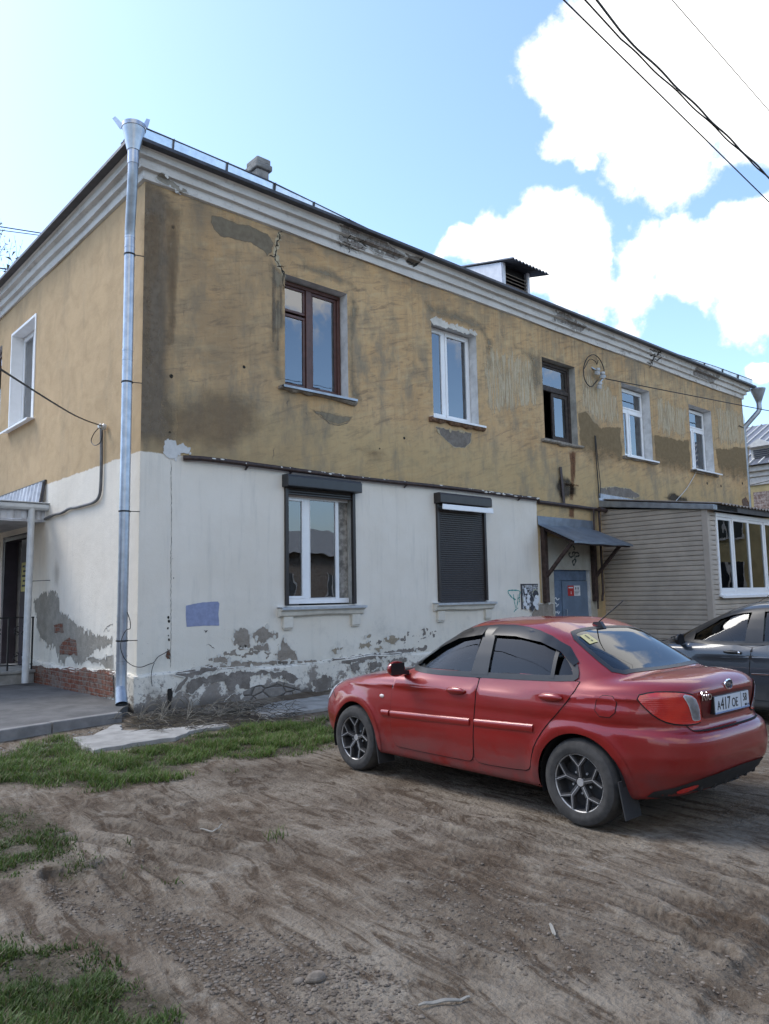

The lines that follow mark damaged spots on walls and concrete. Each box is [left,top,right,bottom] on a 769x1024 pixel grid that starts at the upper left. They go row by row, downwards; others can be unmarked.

peeling [155,171,190,195]
leakage [211,216,273,255]
crack [270,231,286,290]
leakage [141,187,169,439]
leakage [578,374,622,457]
peeling [32,590,115,698]
peeling [167,623,436,709]